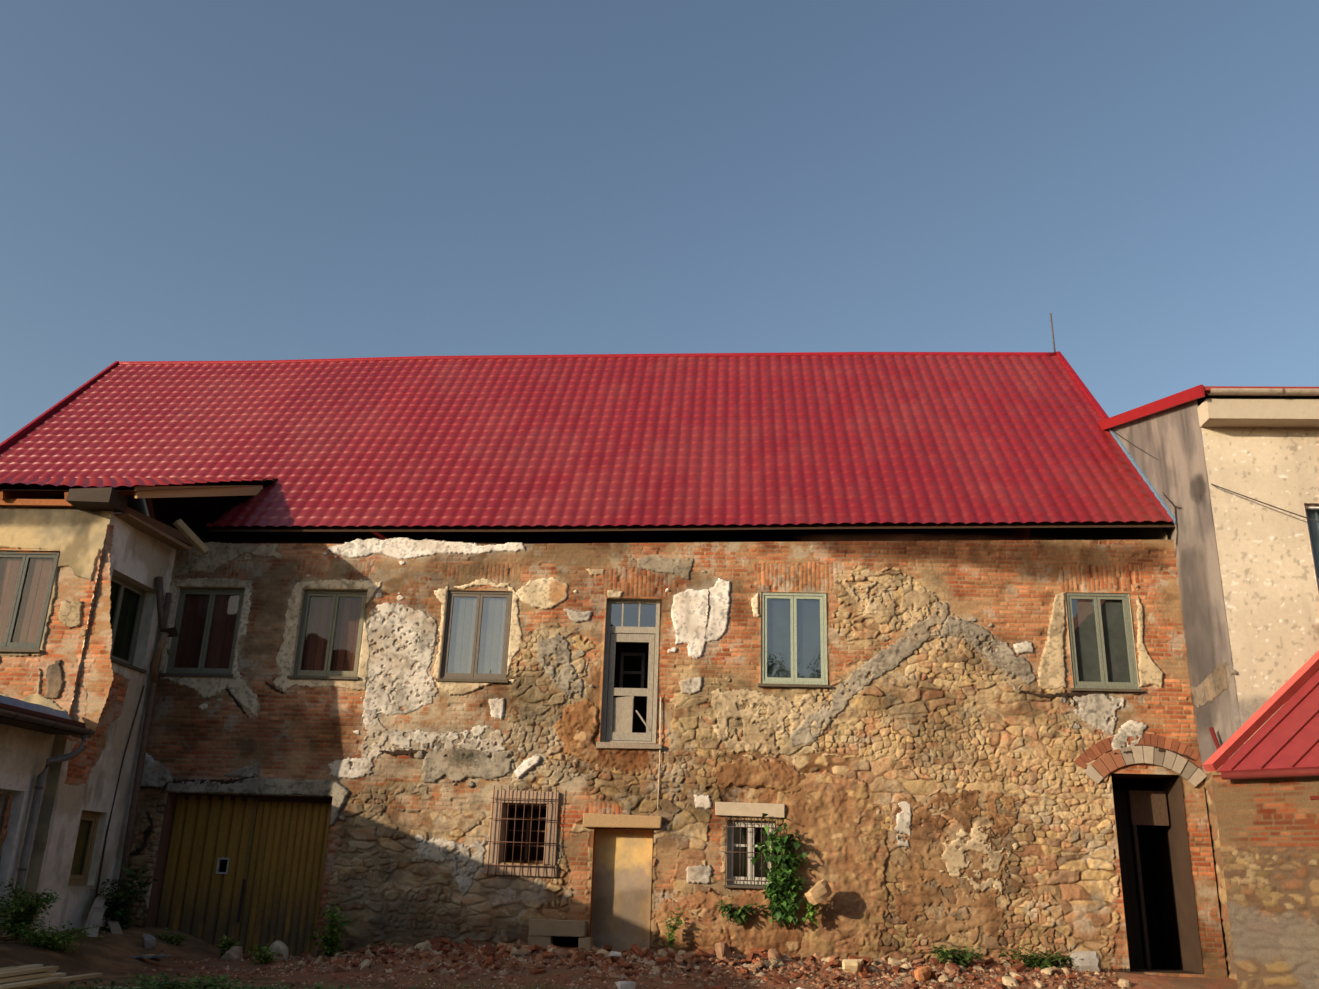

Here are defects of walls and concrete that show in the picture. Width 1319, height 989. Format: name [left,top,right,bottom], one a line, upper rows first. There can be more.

peeling [322,537,526,565]
spalling [0,523,129,786]
peeling [159,542,282,716]
peeling [141,574,594,826]
peeling [631,555,730,659]
peeling [678,676,830,757]
peeling [751,593,760,618]
peeling [1013,592,1147,752]
peeling [1135,585,1164,688]
peeling [694,794,712,810]
peeling [411,834,489,896]
peeling [881,789,1024,953]